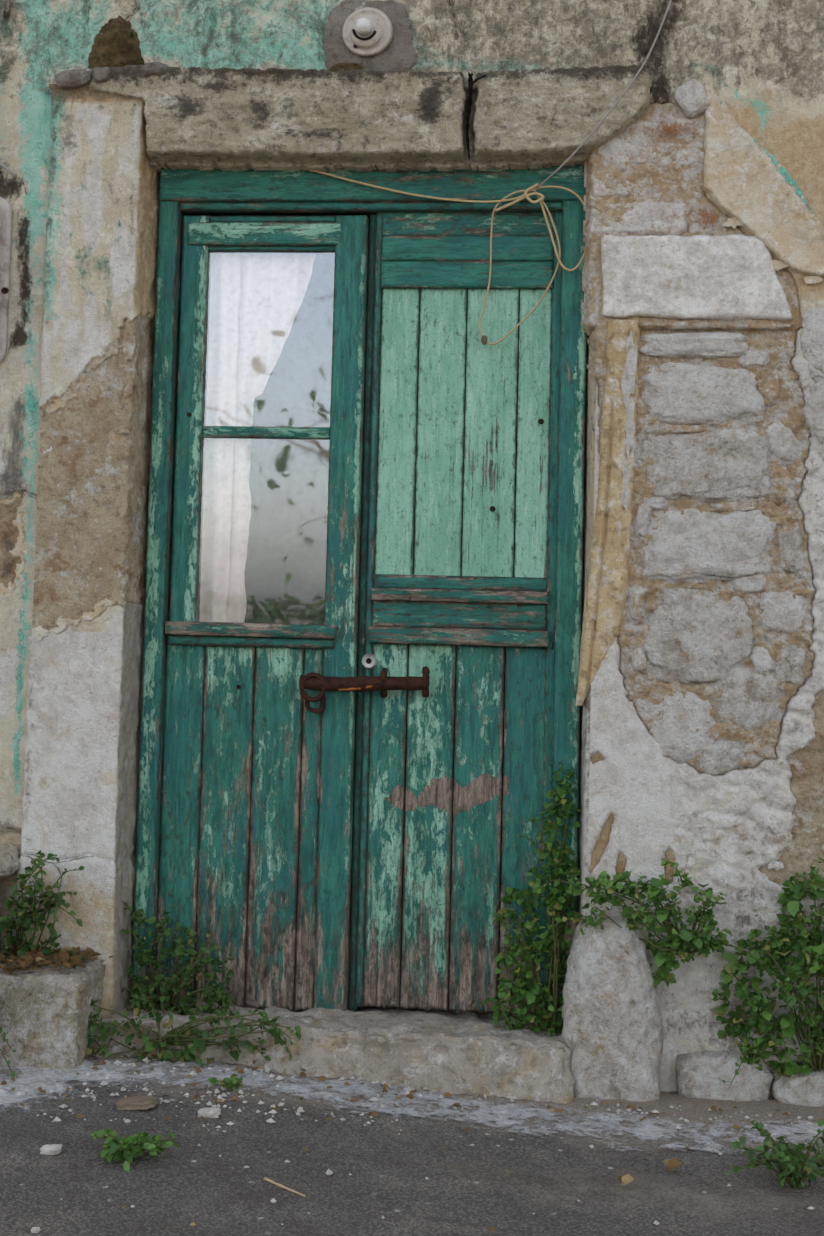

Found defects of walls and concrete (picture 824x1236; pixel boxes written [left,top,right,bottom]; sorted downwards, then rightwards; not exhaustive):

crack [465,73,487,160]
flaking render [582,79,824,335]
flaking render [0,314,155,641]
flaking render [584,752,604,764]
flaking render [585,814,627,878]
flaking render [759,691,824,899]